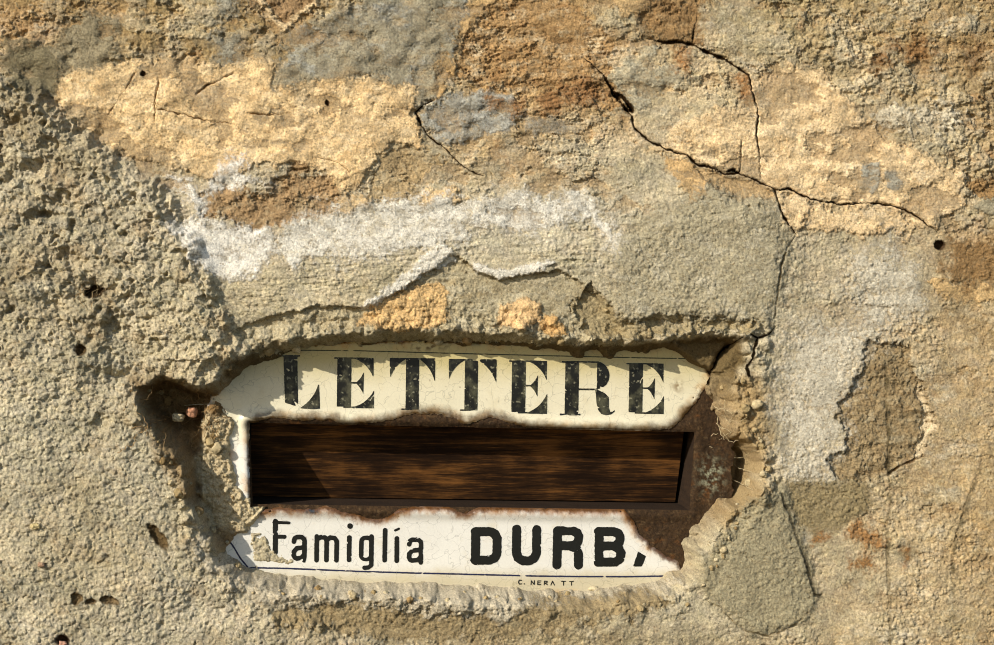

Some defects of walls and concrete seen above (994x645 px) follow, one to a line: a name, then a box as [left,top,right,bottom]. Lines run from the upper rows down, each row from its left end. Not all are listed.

flaking render [0,0,709,232]
water stain [166,152,625,310]
crack [416,100,483,176]
flaking render [231,256,759,358]
crack [585,16,936,385]